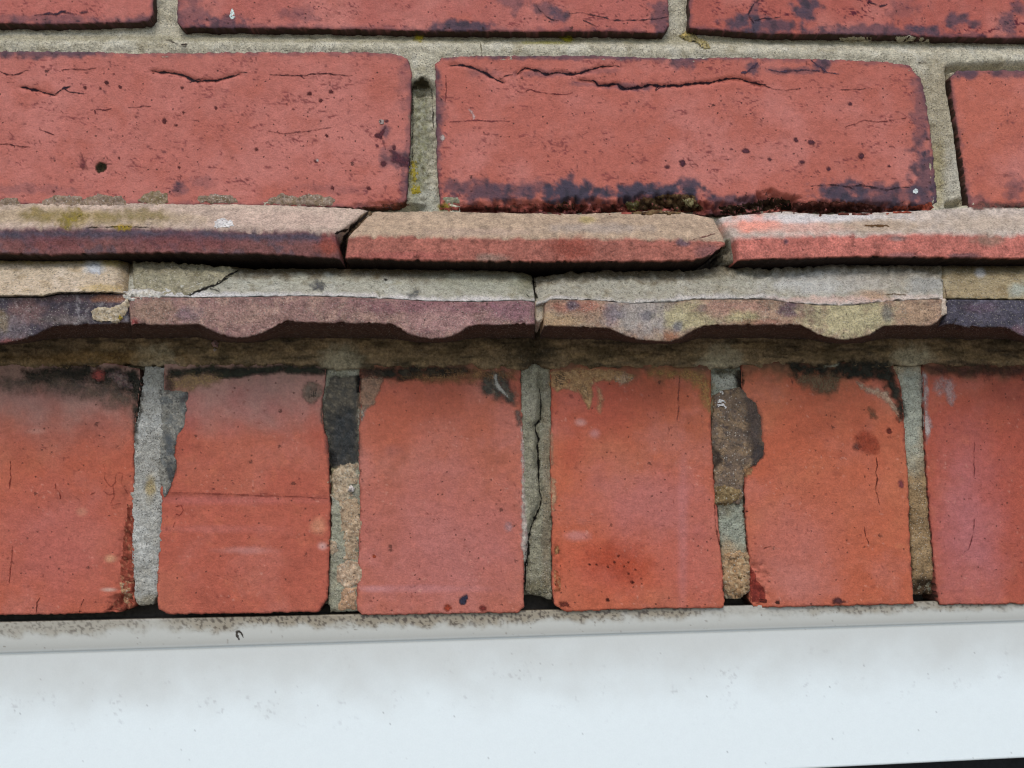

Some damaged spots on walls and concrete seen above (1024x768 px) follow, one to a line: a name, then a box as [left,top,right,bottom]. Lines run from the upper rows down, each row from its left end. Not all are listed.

crack [0,68,151,114]
crack [151,70,352,83]
crack [411,44,866,160]
crack [335,211,369,268]
crack [189,269,239,296]
leakage [0,371,143,435]
leakage [796,363,840,394]
leakage [859,384,898,414]
crack [524,388,542,589]
peeling [327,463,362,611]
peeling [722,550,767,603]